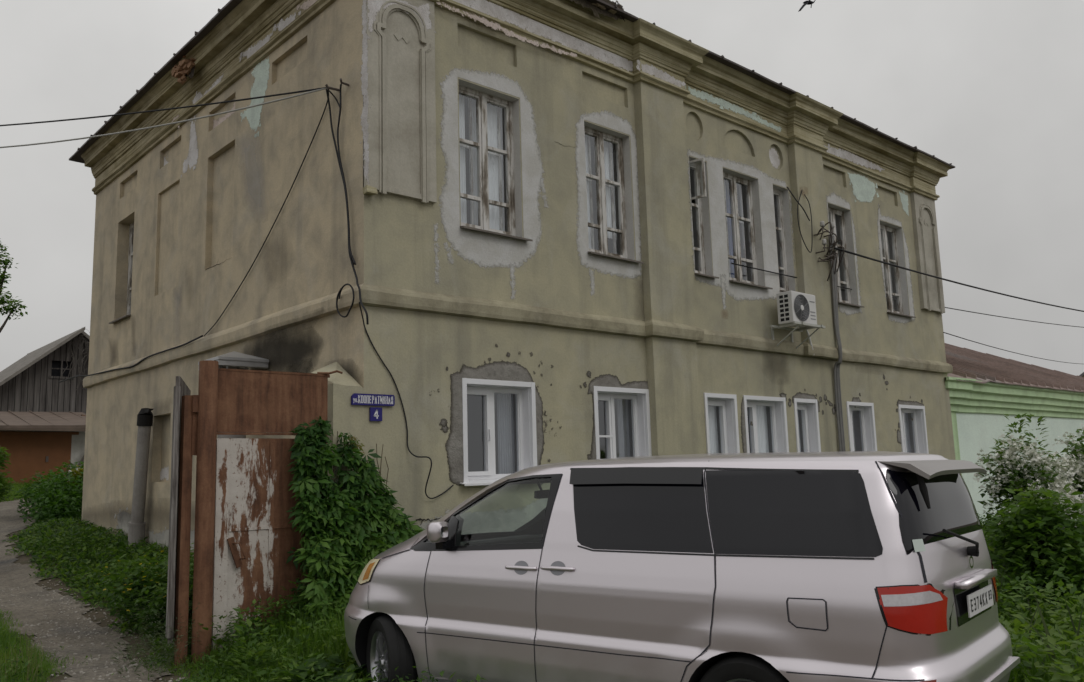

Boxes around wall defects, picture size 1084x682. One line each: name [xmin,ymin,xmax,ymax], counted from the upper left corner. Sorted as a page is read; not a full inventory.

flaking render [172,75,223,177]
flaking render [213,0,317,138]
flaking render [360,0,782,186]
flaking render [825,144,885,202]
flaking render [439,352,545,486]
flaking render [583,371,648,460]
flaking render [419,498,548,534]